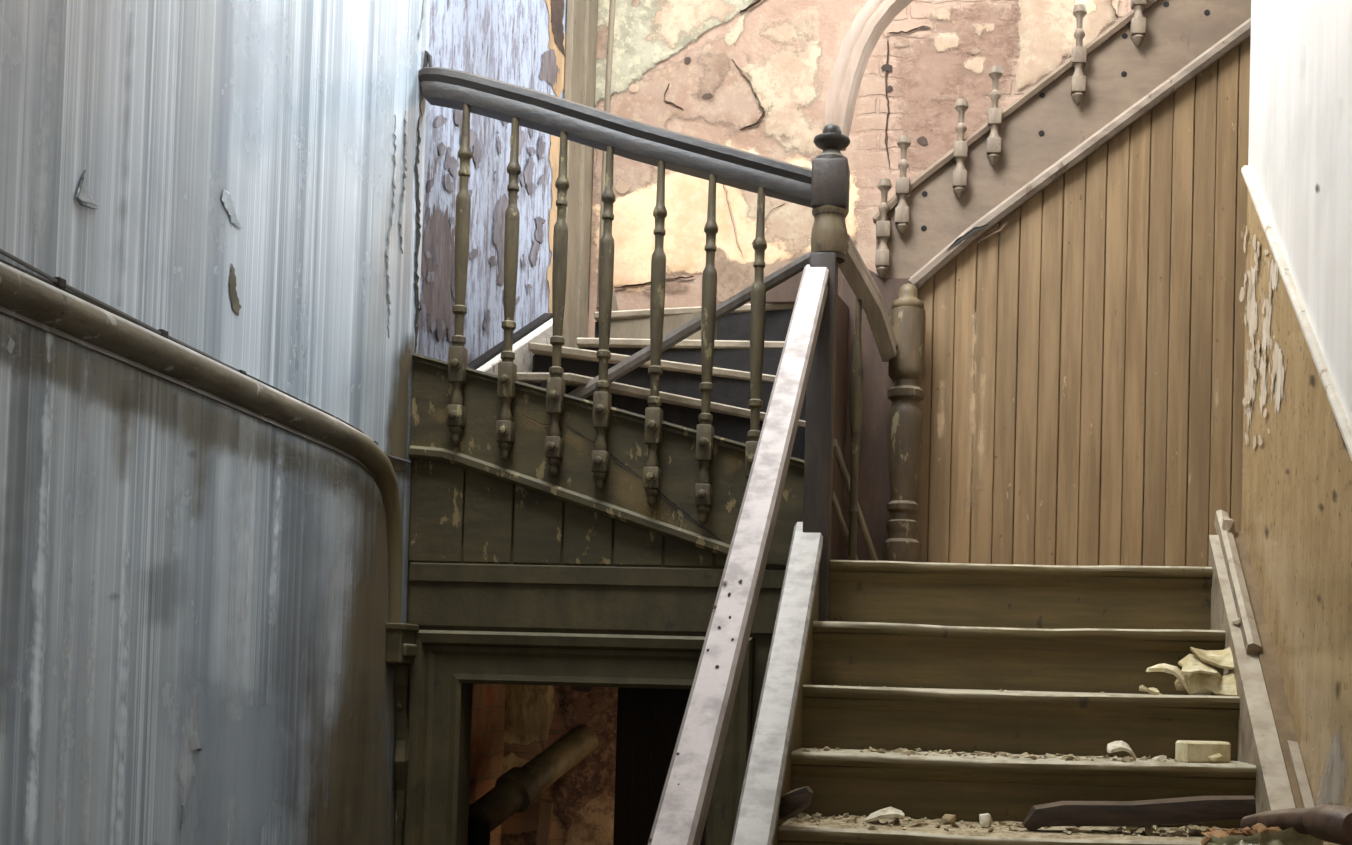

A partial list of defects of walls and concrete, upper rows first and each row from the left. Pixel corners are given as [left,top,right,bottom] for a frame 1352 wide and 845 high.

peeling [538,0,566,97]
flaking render [595,0,823,169]
spalling [881,0,1119,170]
peeling [416,109,560,341]
flaking render [593,148,814,302]
flaking render [845,175,860,243]
peeling [1239,225,1286,448]